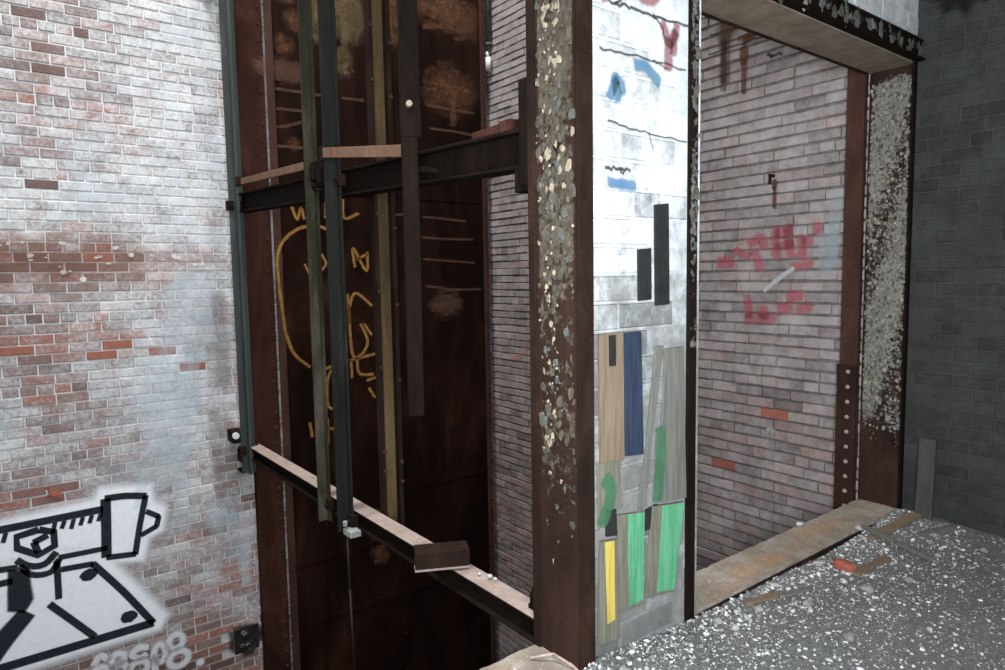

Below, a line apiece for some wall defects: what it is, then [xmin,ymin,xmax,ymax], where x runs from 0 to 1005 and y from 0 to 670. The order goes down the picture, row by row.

crack [609,0,785,58]
crack [600,46,686,71]